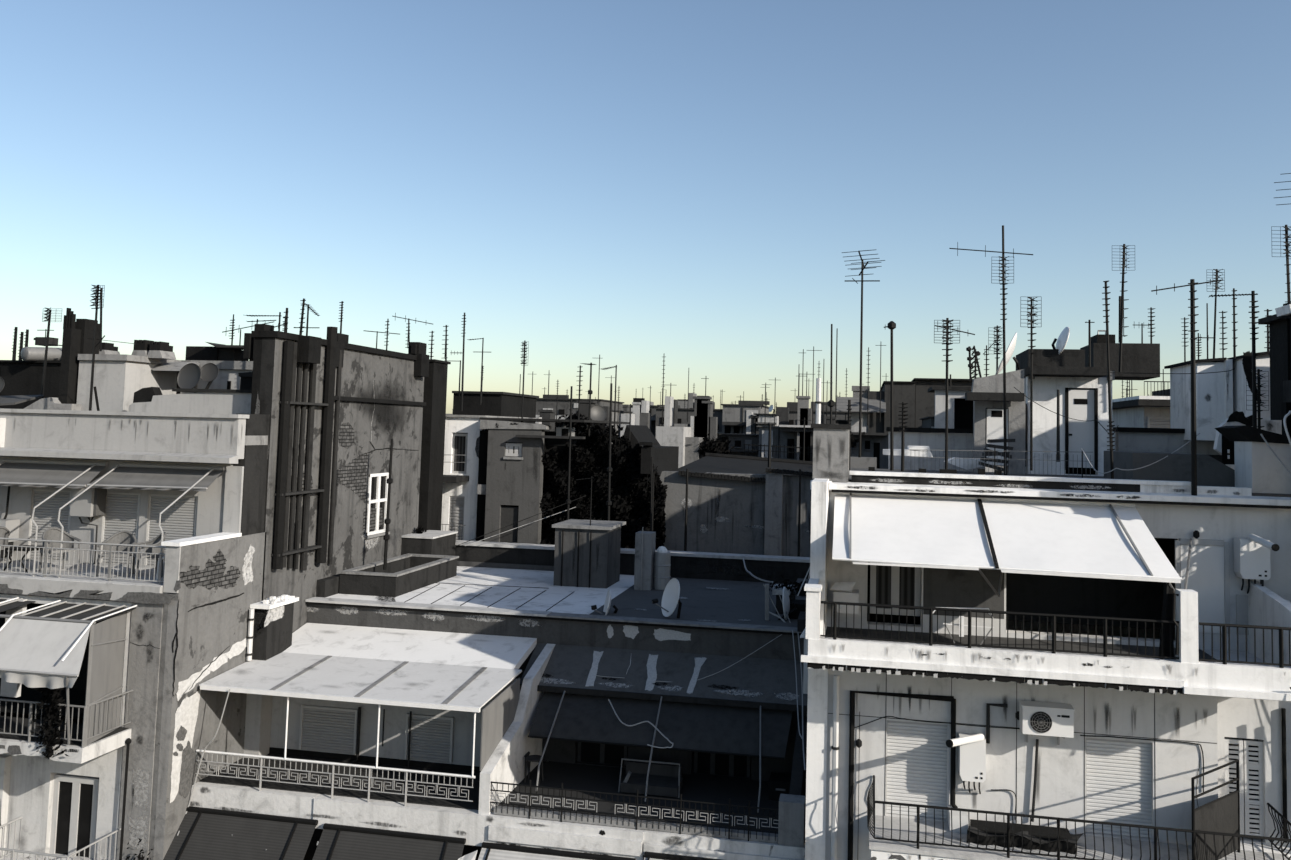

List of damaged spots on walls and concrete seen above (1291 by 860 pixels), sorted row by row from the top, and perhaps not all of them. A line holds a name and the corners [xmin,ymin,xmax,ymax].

spalling [0,394,270,605]